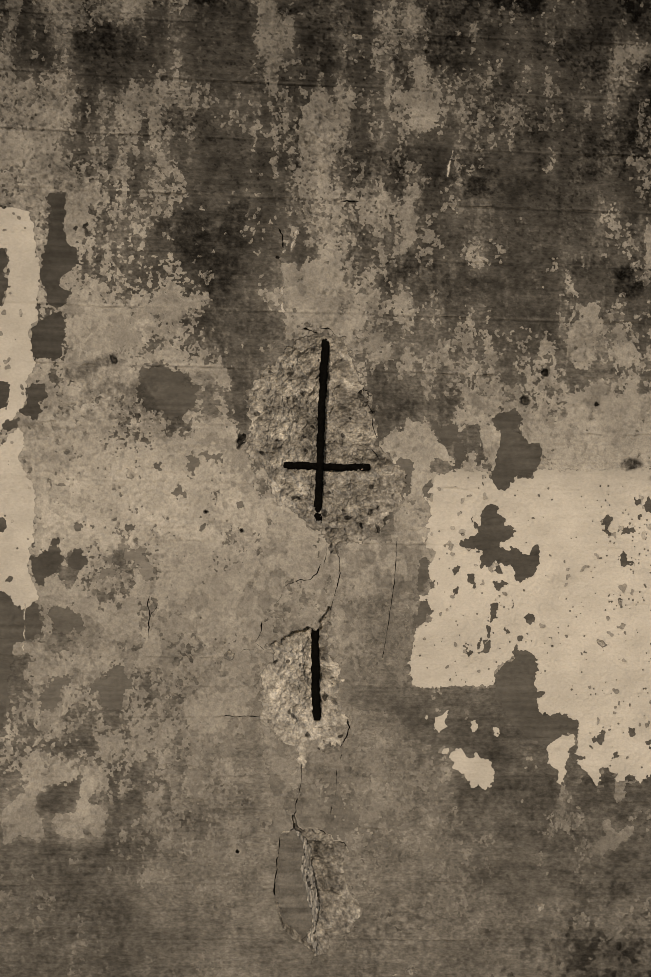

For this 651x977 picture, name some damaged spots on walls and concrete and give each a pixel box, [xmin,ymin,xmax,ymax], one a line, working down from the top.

peeling [44,0,189,37]
peeling [455,21,479,55]
peeling [491,0,574,45]
peeling [600,33,651,129]
peeling [440,146,484,214]
peeling [599,98,651,287]
peeling [240,188,277,256]
peeling [460,236,506,270]
peeling [198,270,214,285]
peeling [559,270,579,298]
peeling [425,708,448,733]
peeling [574,809,651,874]